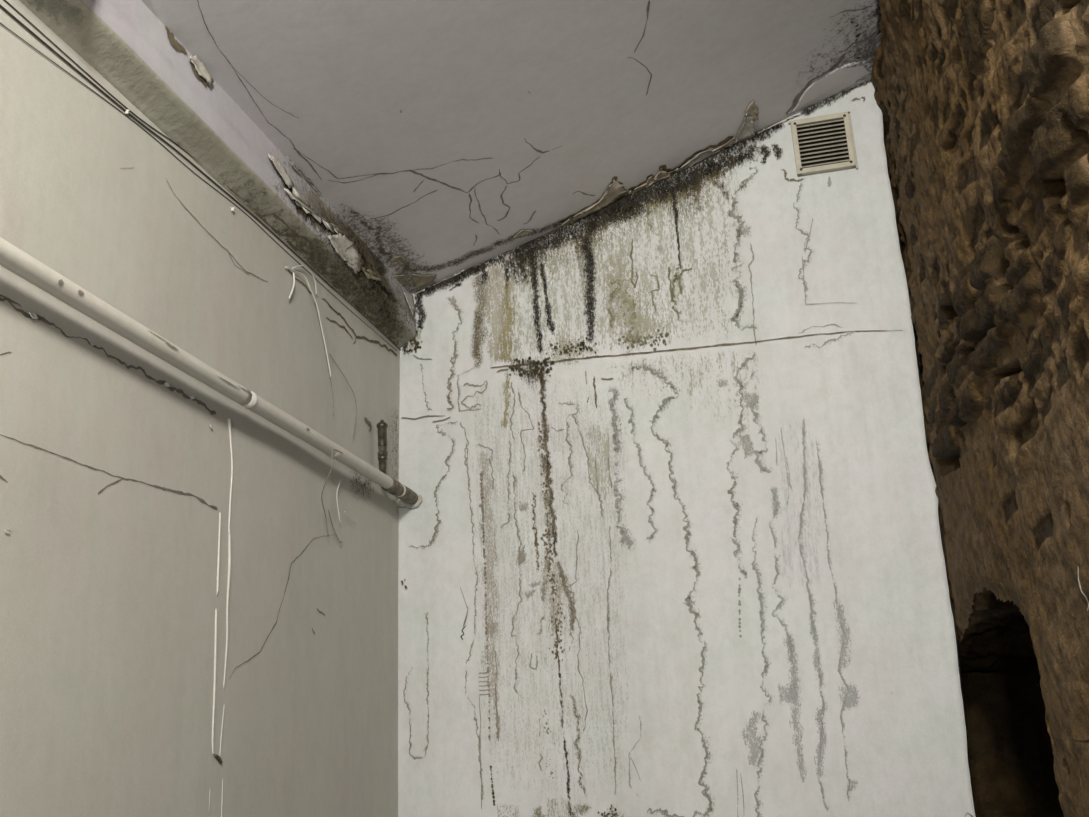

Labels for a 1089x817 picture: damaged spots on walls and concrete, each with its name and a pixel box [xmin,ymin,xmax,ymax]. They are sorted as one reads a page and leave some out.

crack [629,1,652,95]
water stain [800,0,882,115]
crack [197,0,561,242]
flaking render [560,101,799,226]
crack [166,179,430,359]
crack [0,434,217,510]
crack [402,414,450,422]
water stain [222,123,859,817]